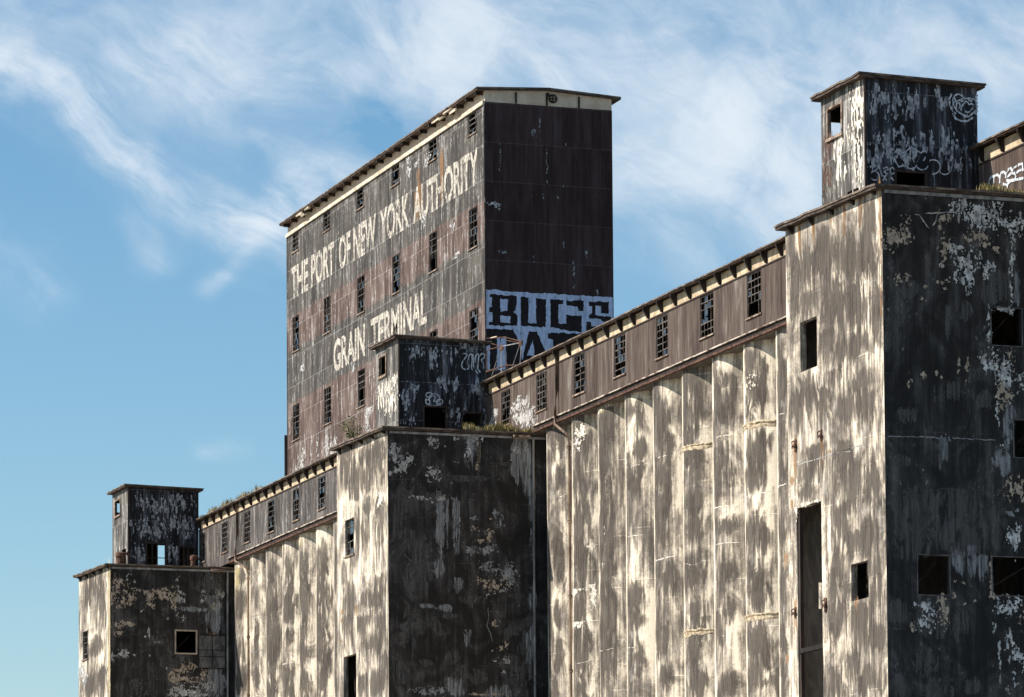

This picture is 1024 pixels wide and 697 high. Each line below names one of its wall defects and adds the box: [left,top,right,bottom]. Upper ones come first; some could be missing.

peeling [833,80,974,189]
peeling [880,215,915,254]
peeling [920,197,1024,300]
peeling [957,303,1024,411]
peeling [388,443,414,477]
leakage [547,199,1018,697]
peeling [463,508,520,596]
peeling [110,573,186,662]
peeling [910,580,976,642]
peeling [989,562,1024,663]
peeling [166,661,215,697]